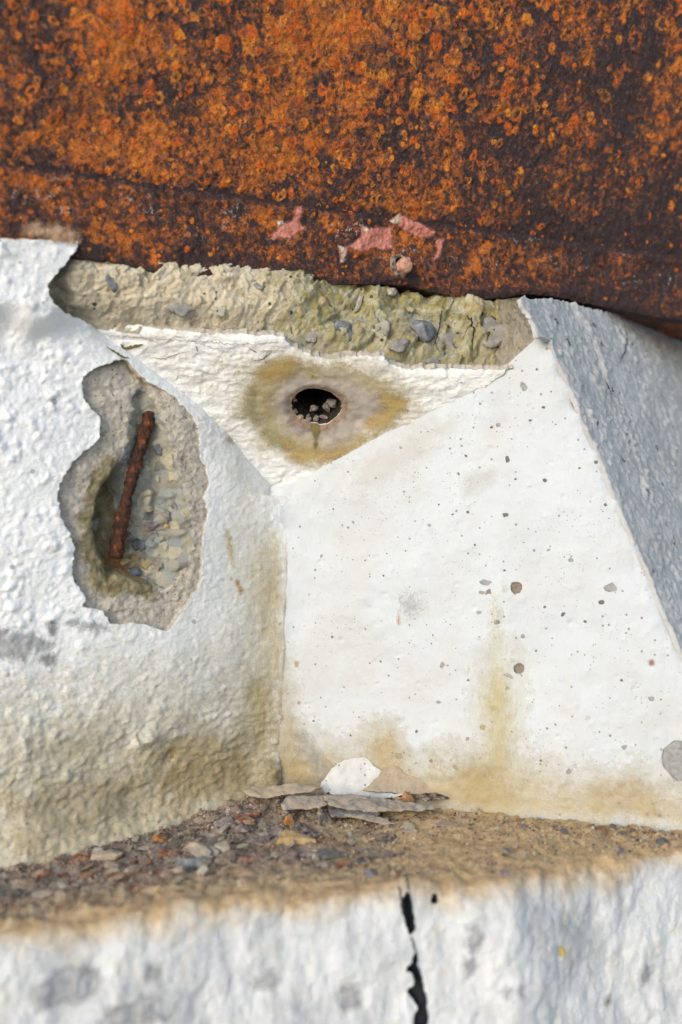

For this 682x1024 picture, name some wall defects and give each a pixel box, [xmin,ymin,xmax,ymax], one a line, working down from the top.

corrosion [22,222,81,244]
spalling [48,259,535,366]
spalling [0,360,208,666]
peeling [243,753,435,819]
damp [391,738,682,826]
crack [398,874,438,1024]